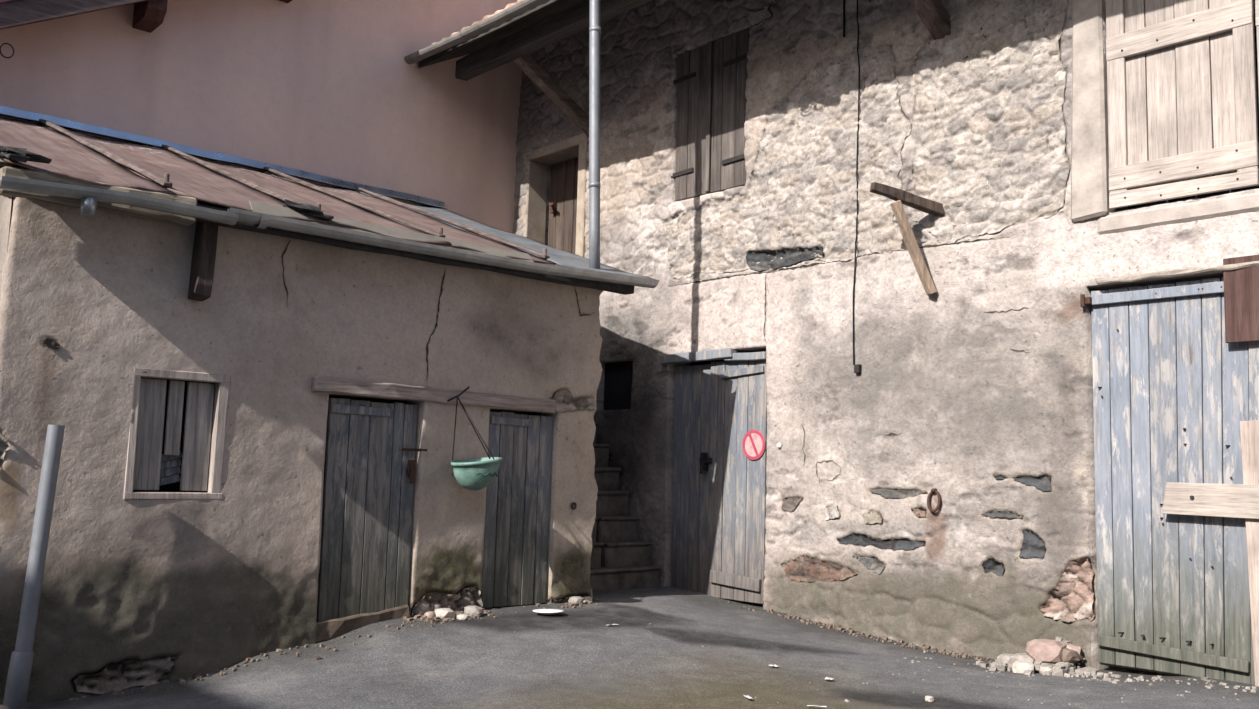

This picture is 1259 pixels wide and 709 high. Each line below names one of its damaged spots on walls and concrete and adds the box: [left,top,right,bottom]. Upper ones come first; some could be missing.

crack [282,239,291,307]
crack [426,269,446,382]
damp [0,597,22,699]
spalling [74,656,182,694]
damp [27,562,317,704]